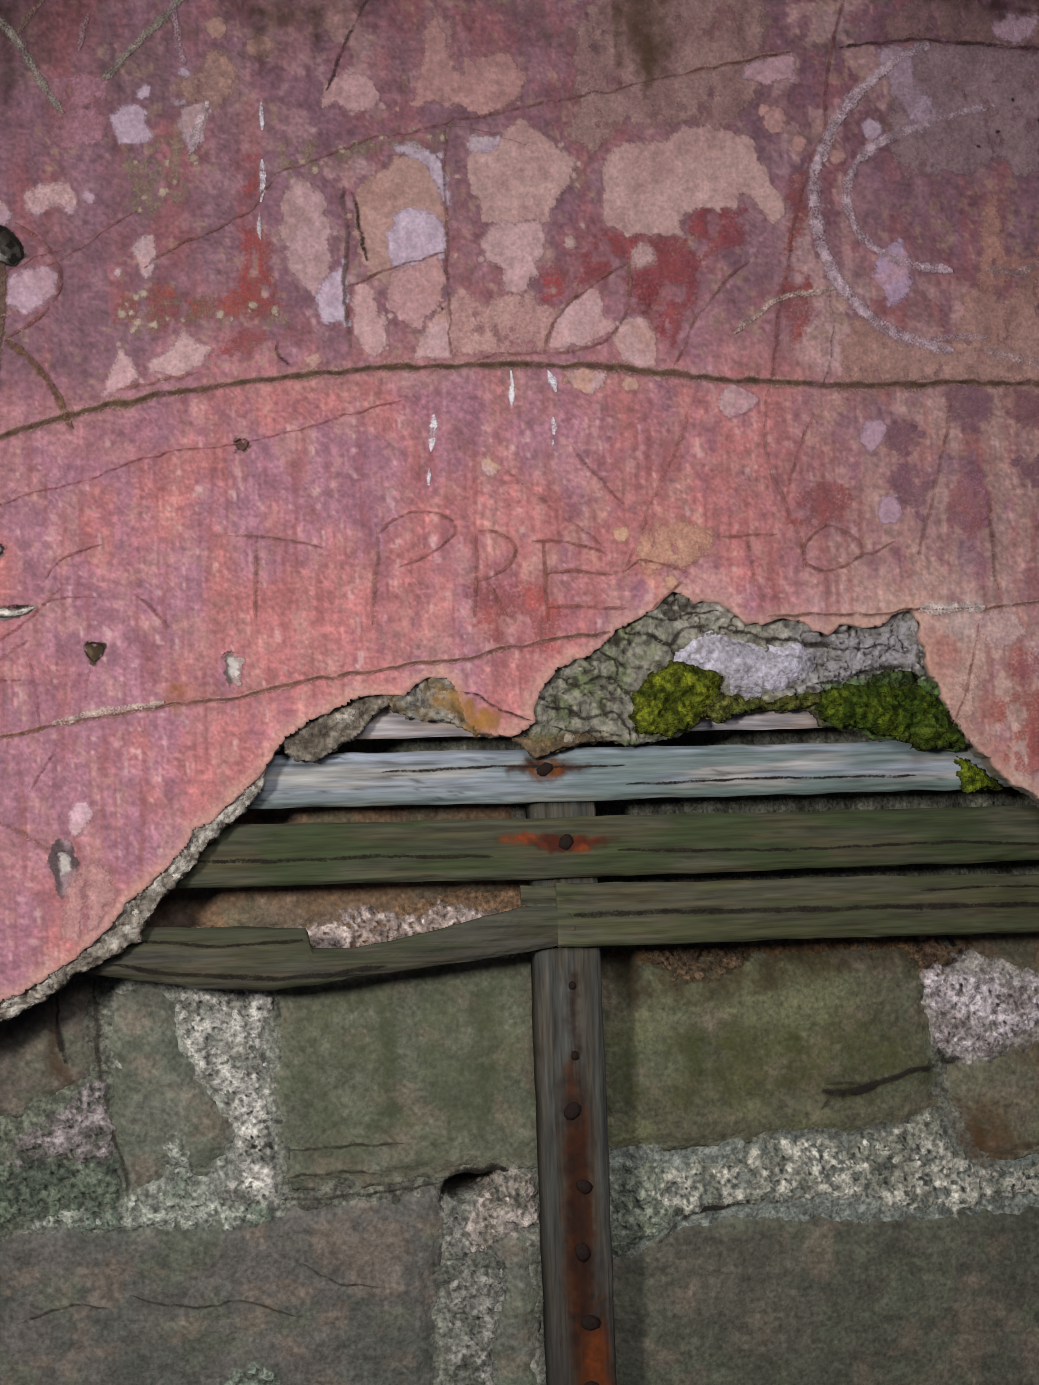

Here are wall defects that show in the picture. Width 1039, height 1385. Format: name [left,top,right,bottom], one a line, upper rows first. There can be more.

crack [0,0,1039,556]
spalling [0,764,268,1022]
crack [0,631,610,738]
spalling [282,677,480,764]
rust [507,759,581,778]
rust [502,833,601,851]
spalling [512,517,1039,771]
crack [945,935,965,956]
spalling [0,988,283,1236]
rust [563,1066,608,1385]
spalling [609,1109,1039,1256]
crack [821,1047,959,1110]